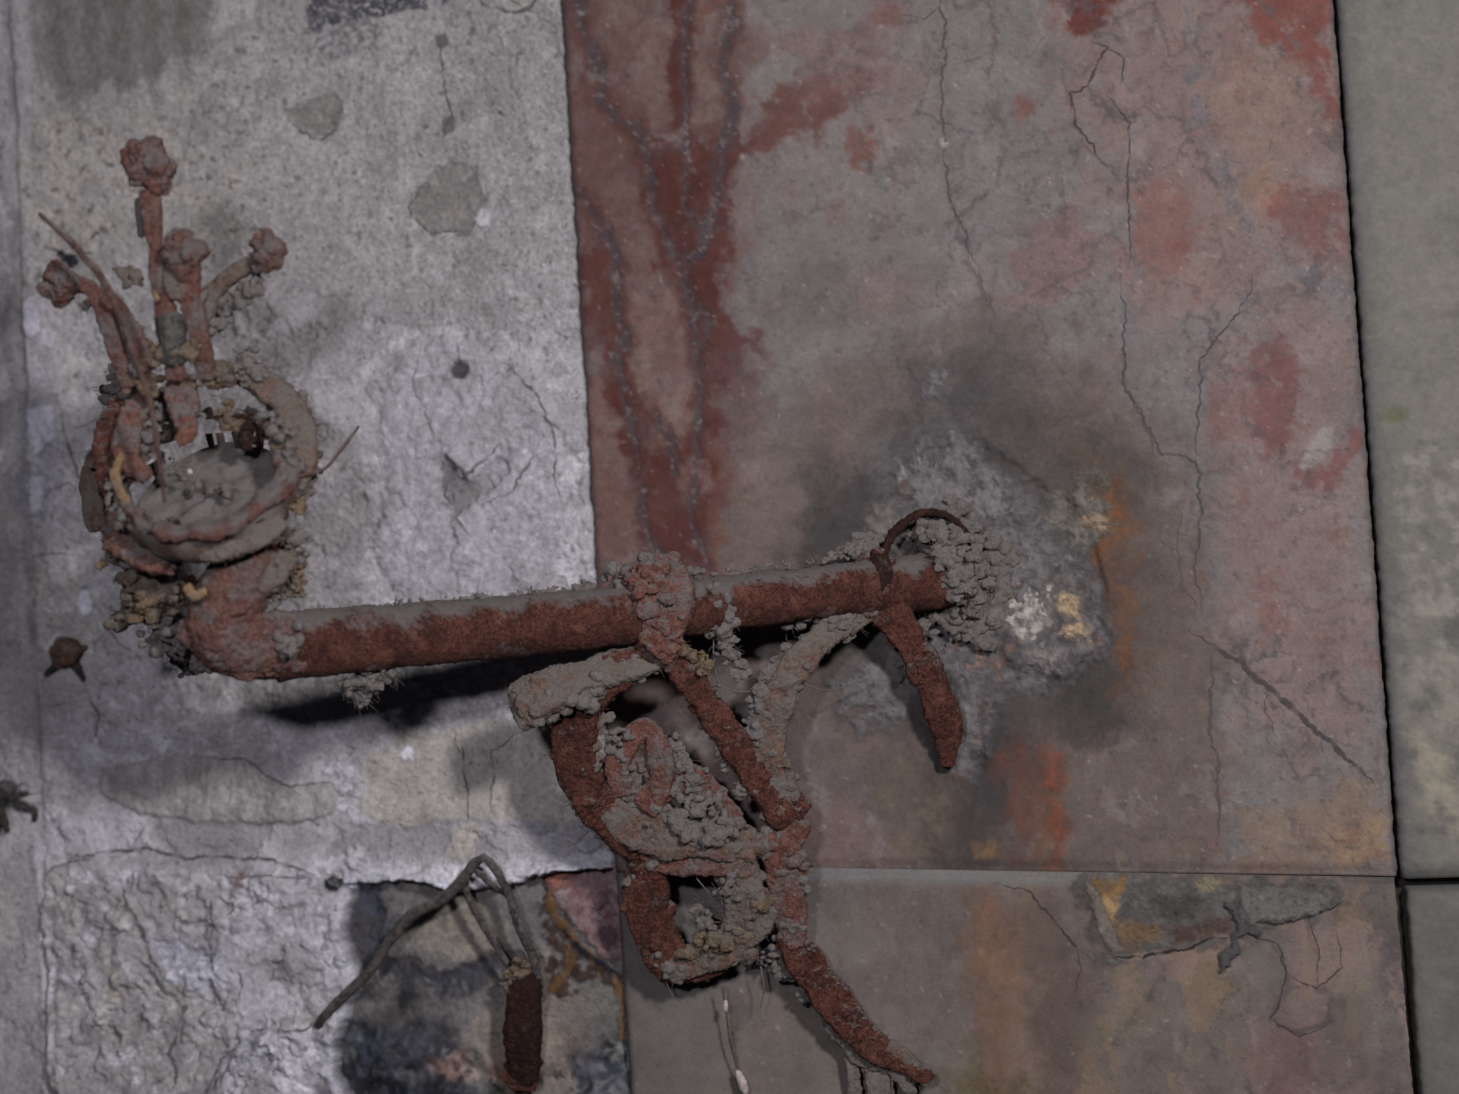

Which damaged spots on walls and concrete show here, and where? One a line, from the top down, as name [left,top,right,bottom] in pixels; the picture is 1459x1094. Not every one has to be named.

water stain [33,0,207,98]
crack [900,6,994,317]
crack [1069,33,1379,846]
water stain [889,357,1126,870]
rust [539,892,624,1039]
spalling [1072,872,1344,973]